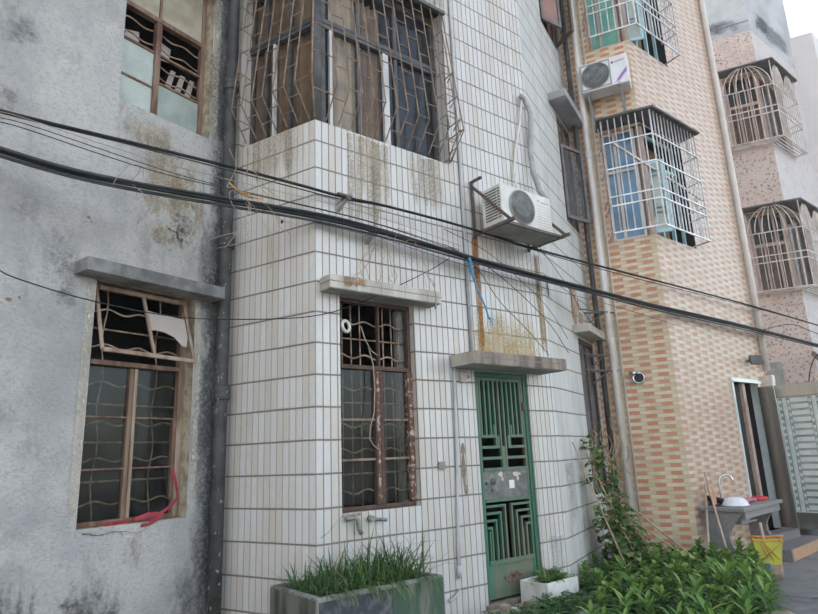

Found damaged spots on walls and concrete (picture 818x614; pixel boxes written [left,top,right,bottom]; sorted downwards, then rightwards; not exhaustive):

leakage [201,1,227,286]
corrosion [471,238,548,356]
leakage [183,301,218,614]